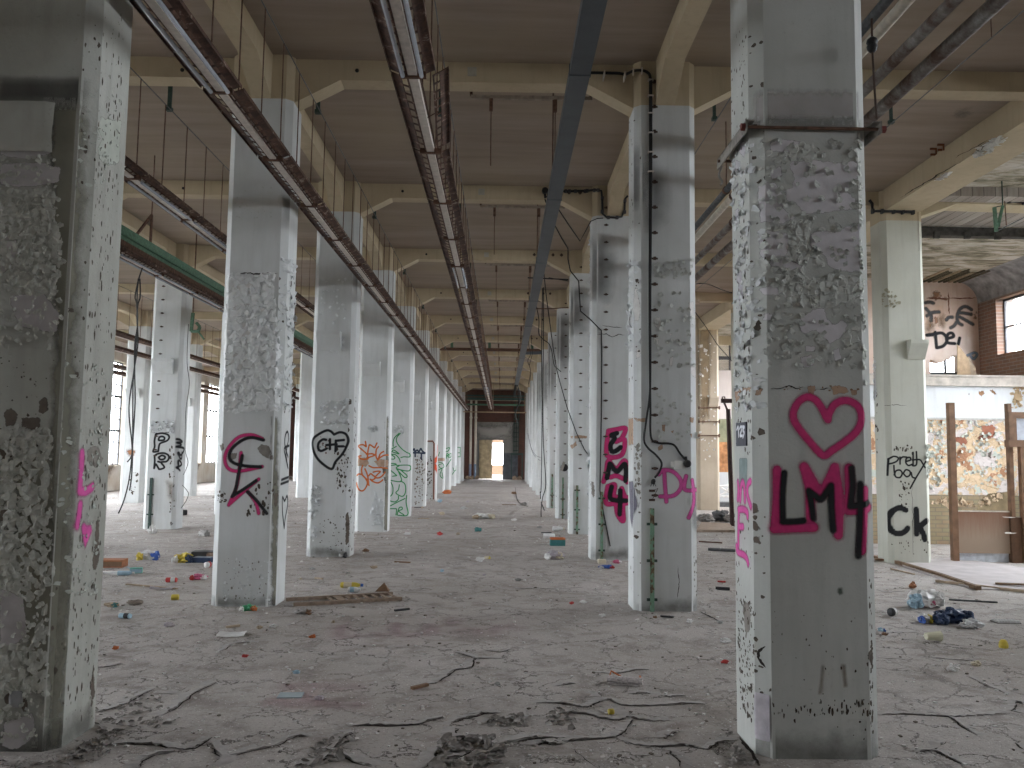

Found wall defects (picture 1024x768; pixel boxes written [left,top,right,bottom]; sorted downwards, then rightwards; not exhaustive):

peeling [729,28,878,454]
peeling [0,18,122,749]
peeling [222,257,298,414]
spalling [925,420,1008,511]
crack [95,668,759,768]
crack [421,648,511,684]
crack [757,646,766,668]
crack [877,656,1024,765]